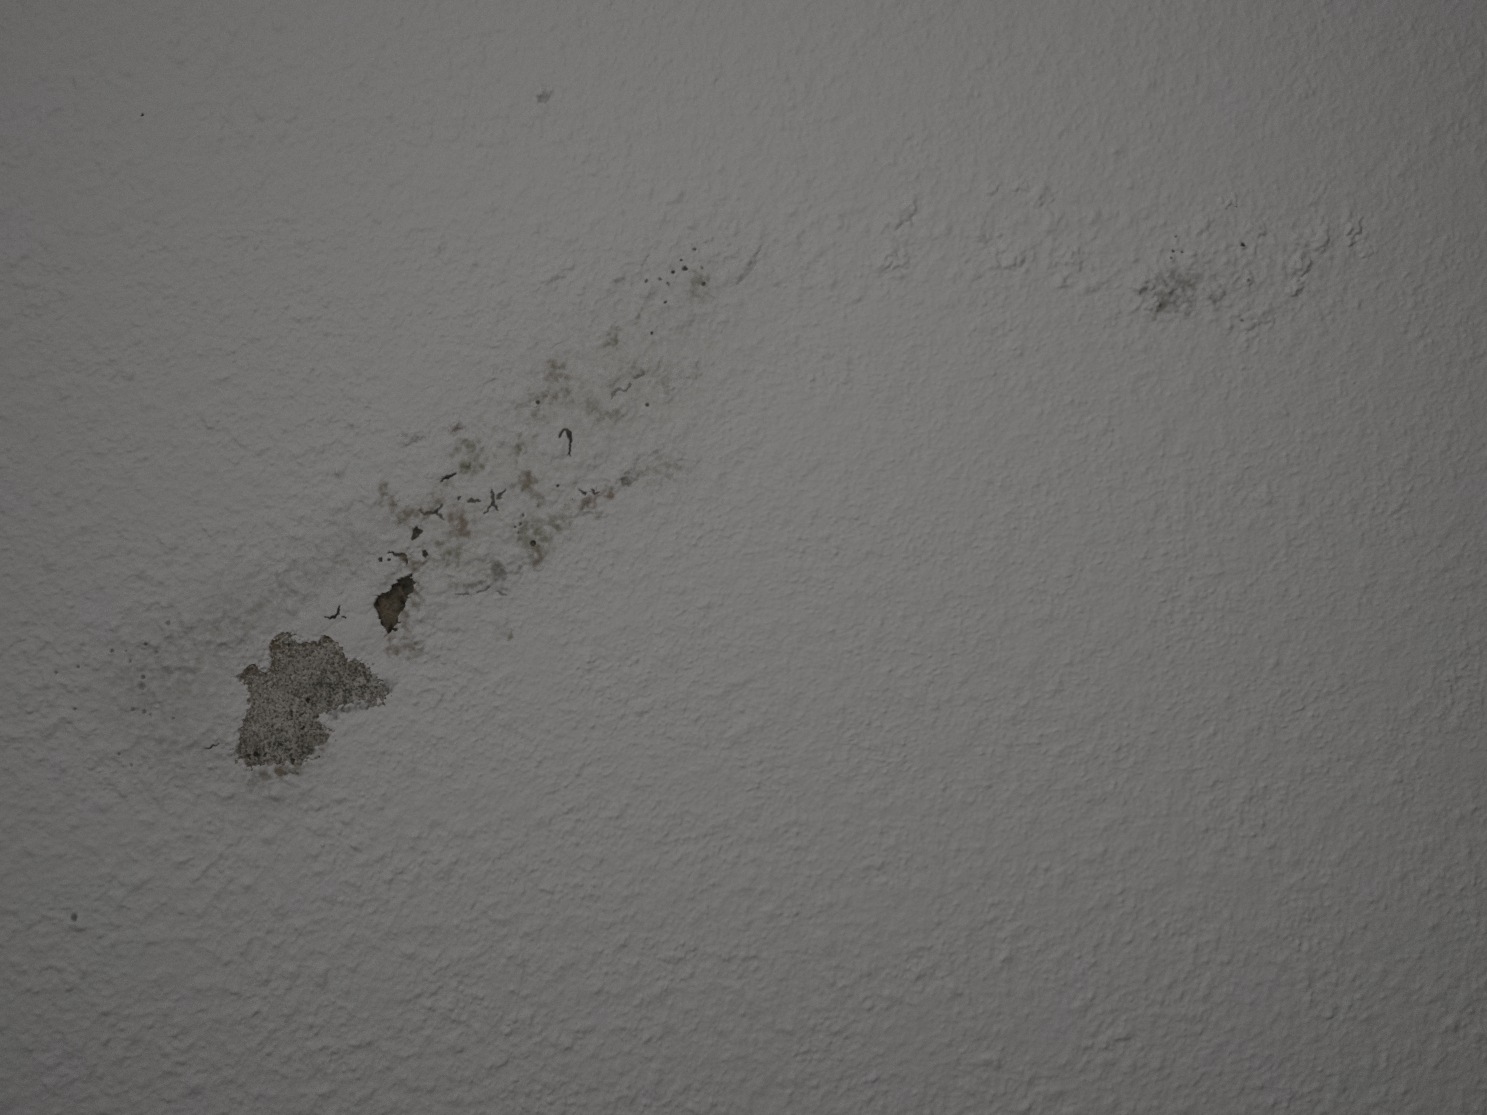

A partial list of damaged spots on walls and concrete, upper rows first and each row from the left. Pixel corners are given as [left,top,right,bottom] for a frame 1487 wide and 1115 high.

peeling [374,574,416,634]
peeling [235,632,392,775]